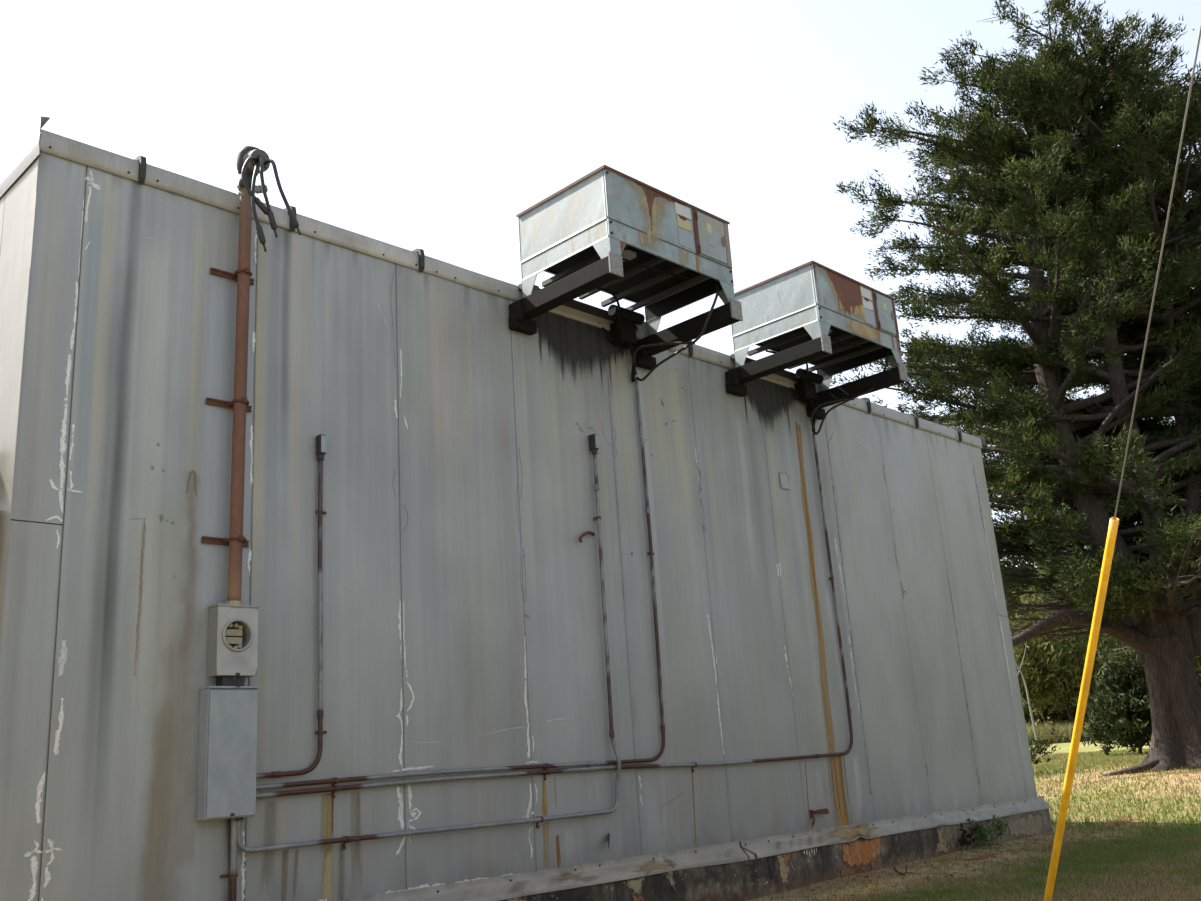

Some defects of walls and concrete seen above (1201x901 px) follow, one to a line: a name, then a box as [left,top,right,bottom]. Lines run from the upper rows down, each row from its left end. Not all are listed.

rust [620,181,701,272]
rust [813,263,902,360]
rust [796,424,881,877]
rust [322,792,360,901]